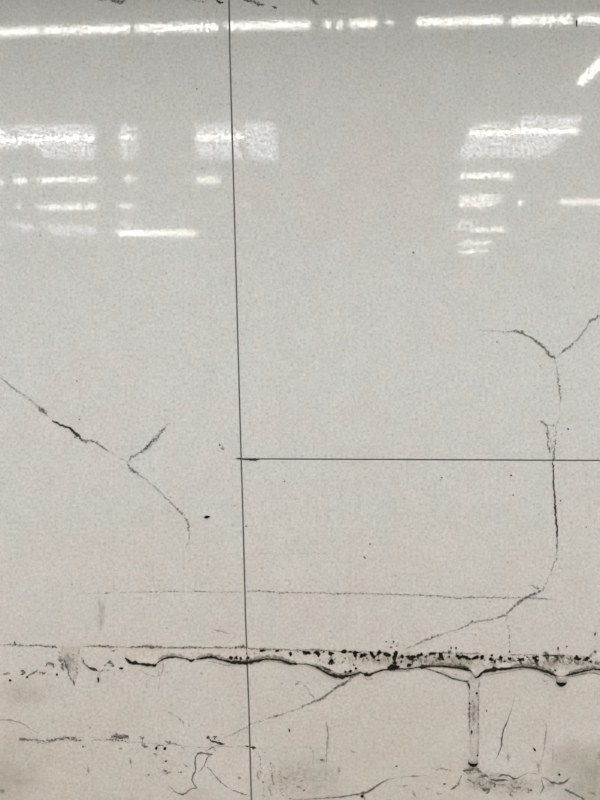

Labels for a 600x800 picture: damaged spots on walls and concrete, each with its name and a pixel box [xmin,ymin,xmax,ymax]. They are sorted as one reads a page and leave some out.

crack [491,315,599,400]
crack [4,380,107,451]
crack [128,428,165,477]
crack [541,421,558,568]
crack [408,587,544,630]
leakage [451,677,496,794]